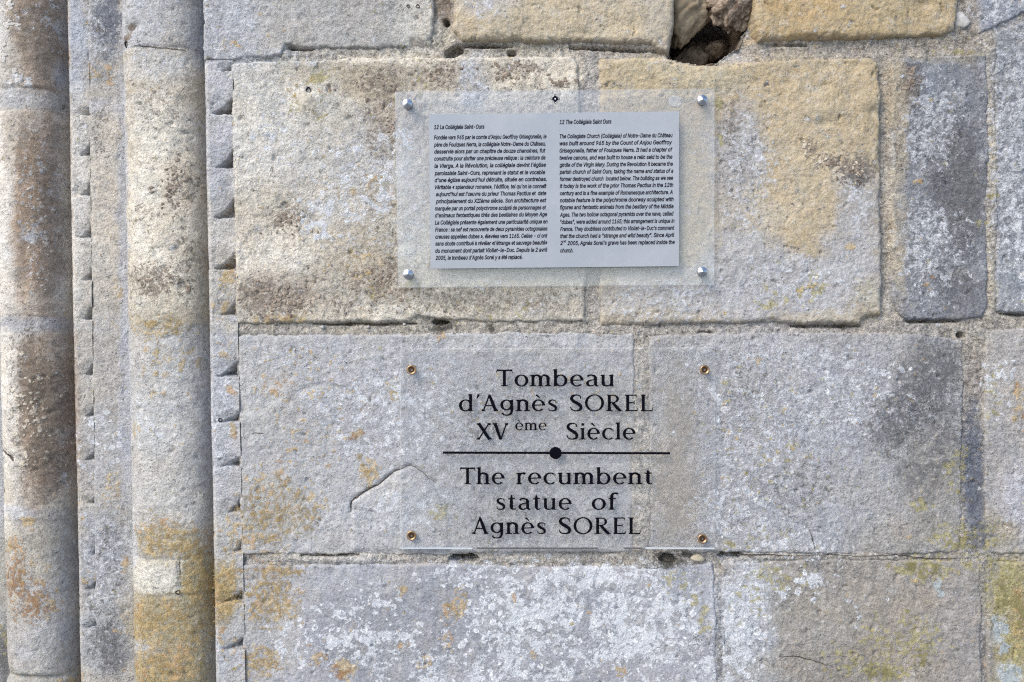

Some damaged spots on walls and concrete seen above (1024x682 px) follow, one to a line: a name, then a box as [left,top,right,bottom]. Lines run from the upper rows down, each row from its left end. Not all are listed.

spalling [669,0,752,66]
crack [350,465,435,512]